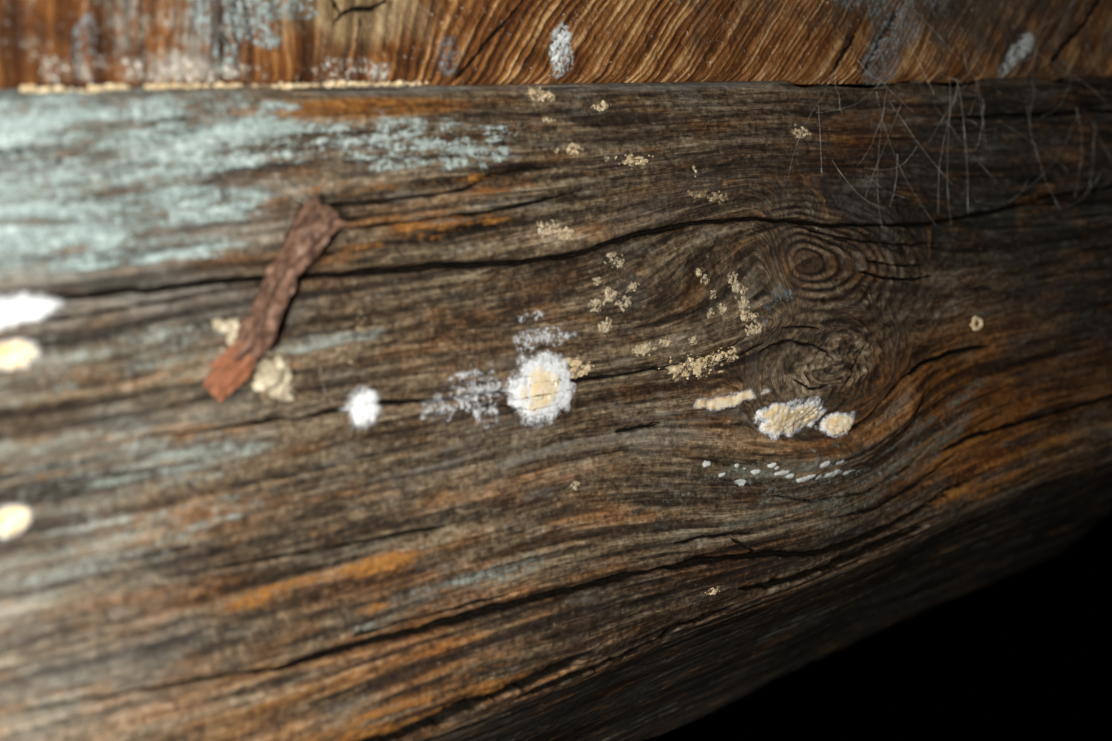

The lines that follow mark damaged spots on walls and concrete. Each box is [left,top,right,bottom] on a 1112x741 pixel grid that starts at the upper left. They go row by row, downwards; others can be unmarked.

crack [297,186,1112,281]
damp [0,292,60,371]
crack [4,275,264,320]
damp [283,334,346,352]
crack [377,388,513,408]
mould [420,311,576,428]
crack [570,326,863,390]
damp [674,379,985,535]
crack [21,394,1112,741]